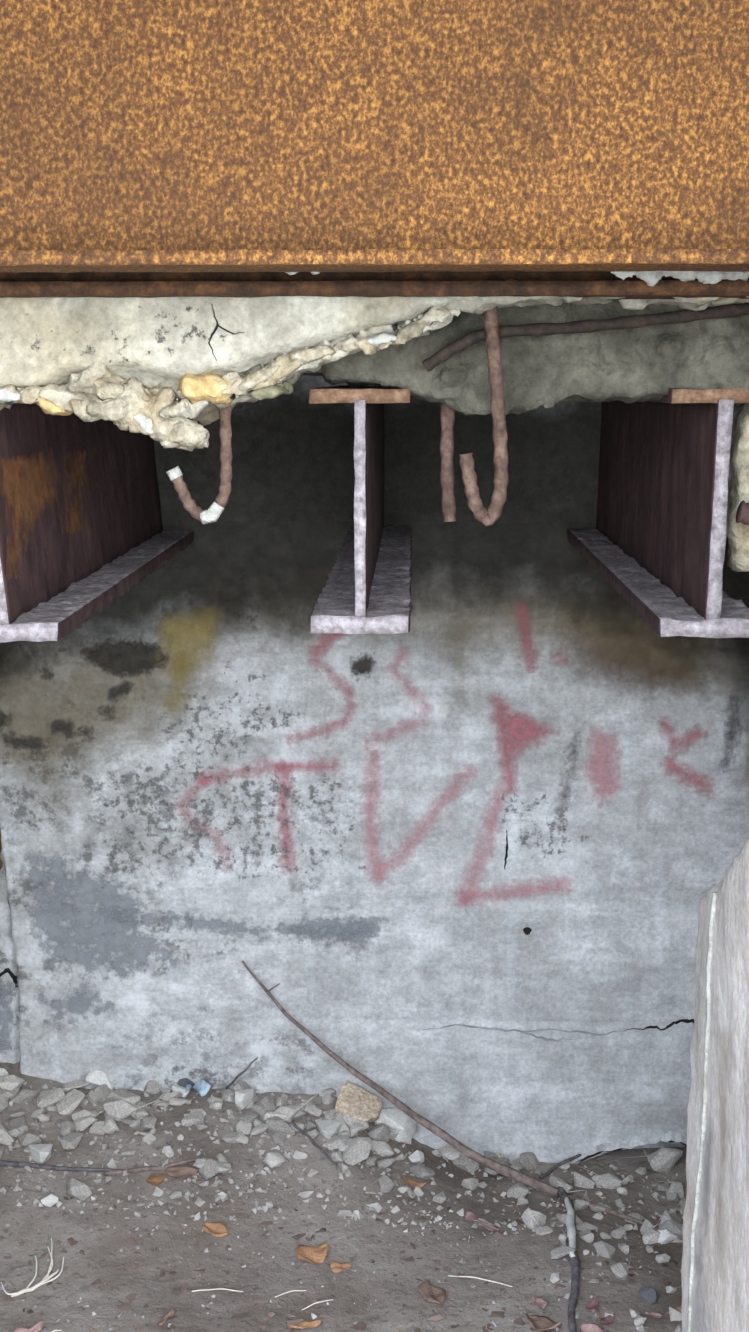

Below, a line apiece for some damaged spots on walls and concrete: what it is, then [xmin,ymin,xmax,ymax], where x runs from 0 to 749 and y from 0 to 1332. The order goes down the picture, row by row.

crack [208,306,244,361]
spalling [0,302,749,572]
leakage [0,615,212,750]
leakage [162,675,291,761]
crack [0,968,18,988]
crack [423,1019,694,1042]
crack [574,1148,626,1164]